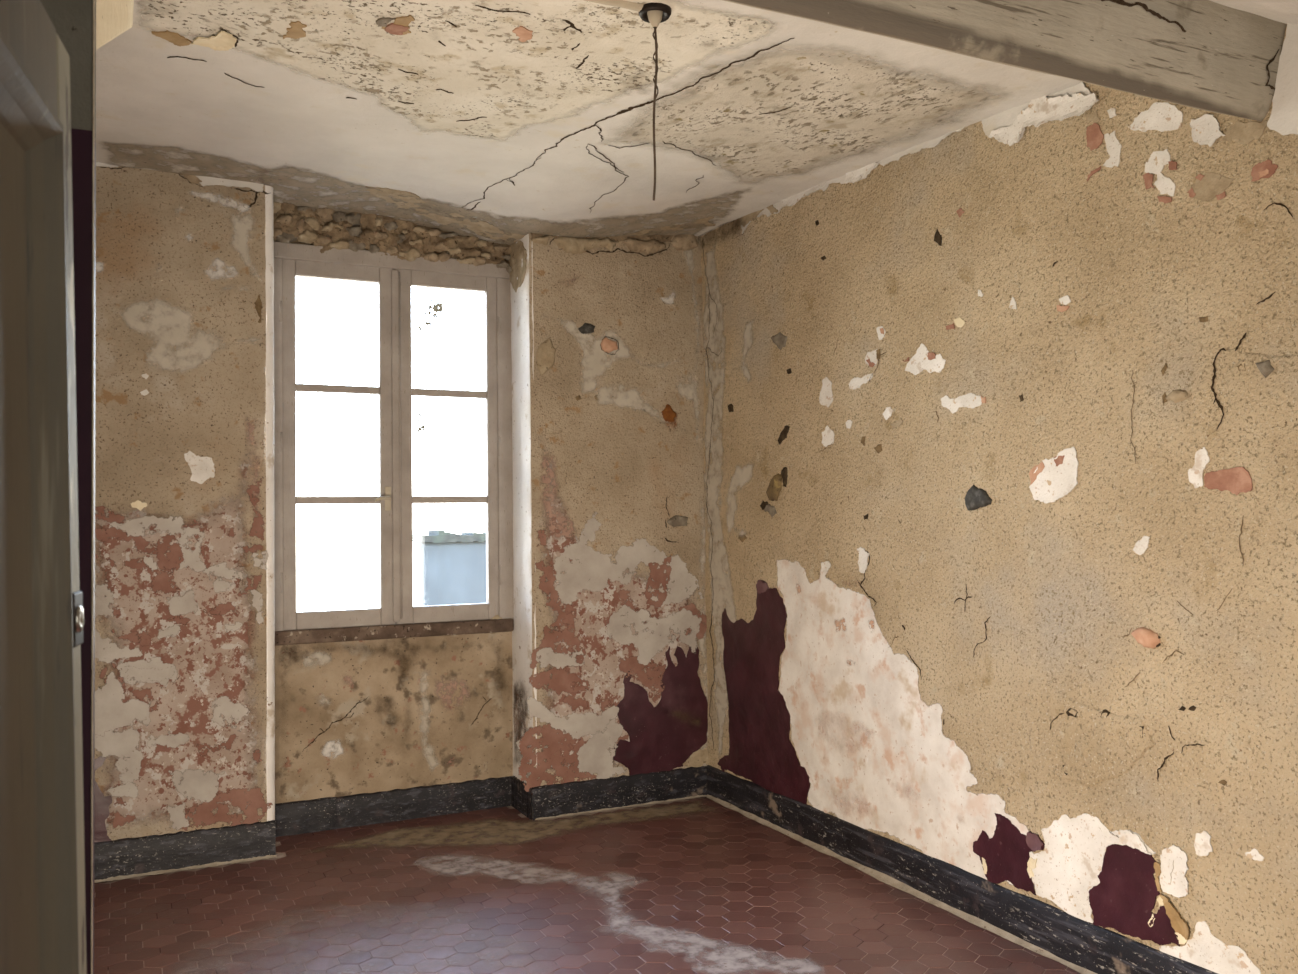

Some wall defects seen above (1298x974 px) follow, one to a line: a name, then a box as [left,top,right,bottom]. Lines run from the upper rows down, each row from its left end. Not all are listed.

crack [1101,0,1186,32]
crack [462,38,794,213]
peeling [140,0,1298,292]
peeling [184,451,215,484]
damp [105,143,753,768]
peeling [1029,447,1079,504]
peeling [1188,447,1253,496]
peeling [95,463,273,831]
peeling [513,458,1261,974]
peeling [1245,848,1265,861]